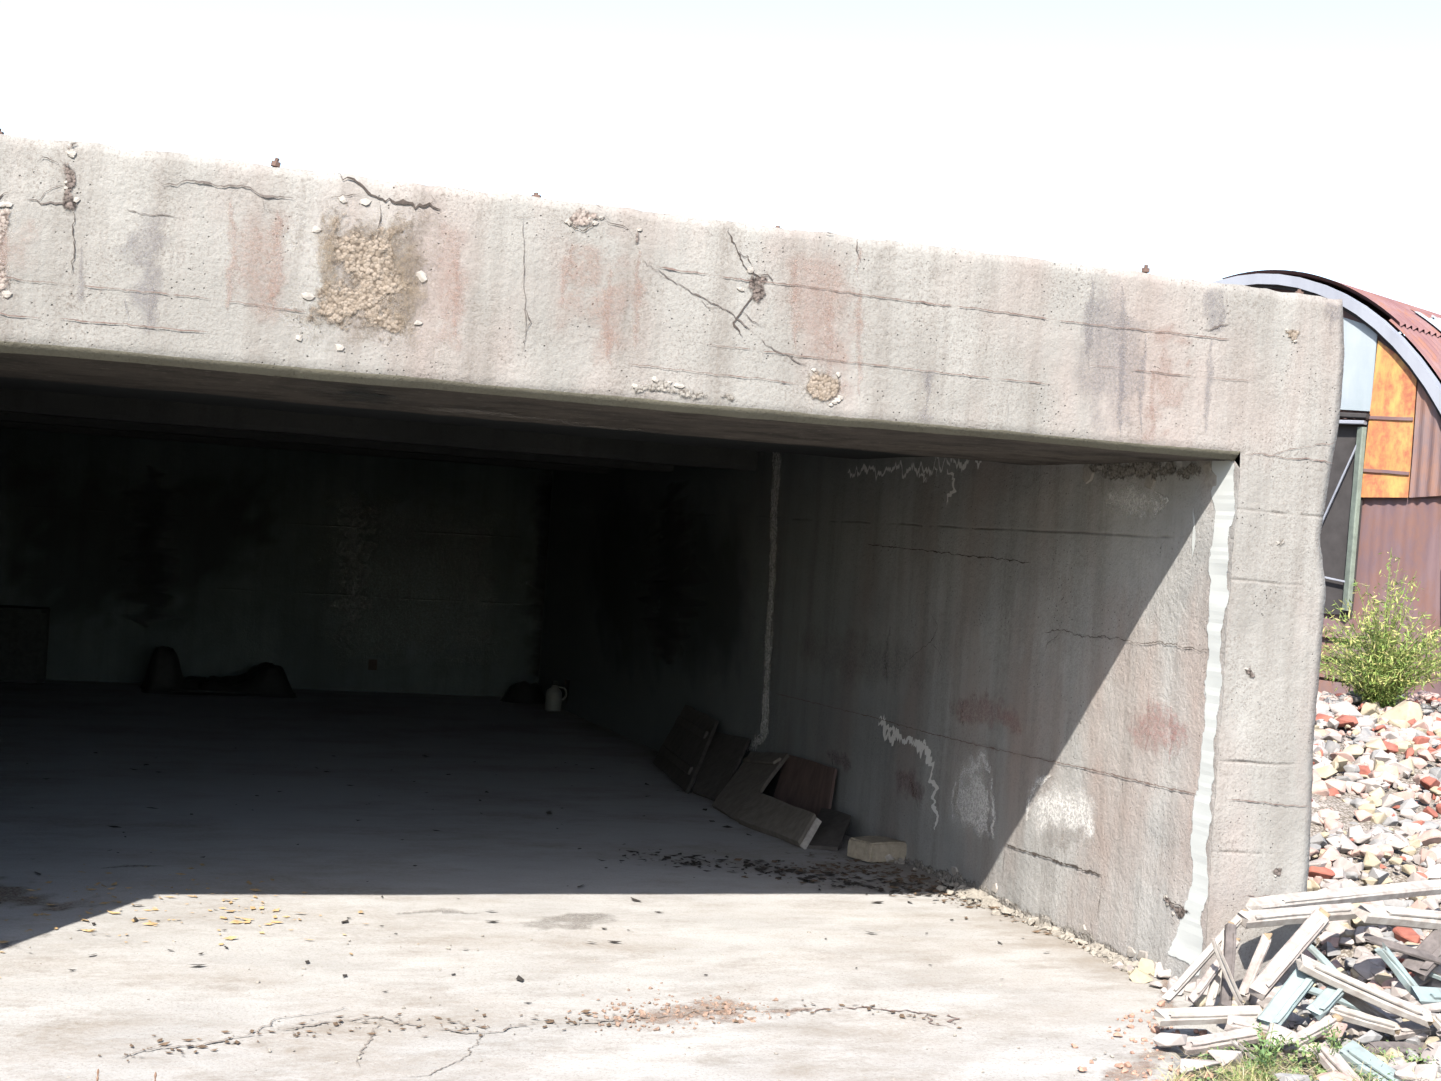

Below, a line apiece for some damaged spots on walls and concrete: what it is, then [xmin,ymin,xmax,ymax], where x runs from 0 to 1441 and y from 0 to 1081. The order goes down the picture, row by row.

crack [0,185,73,205]
spalling [38,142,81,273]
crack [127,180,294,218]
crack [335,173,441,246]
spalling [296,195,428,351]
crack [632,228,1228,423]
spalling [806,368,844,407]
leakage [1026,776,1094,837]
crack [1002,844,1102,910]